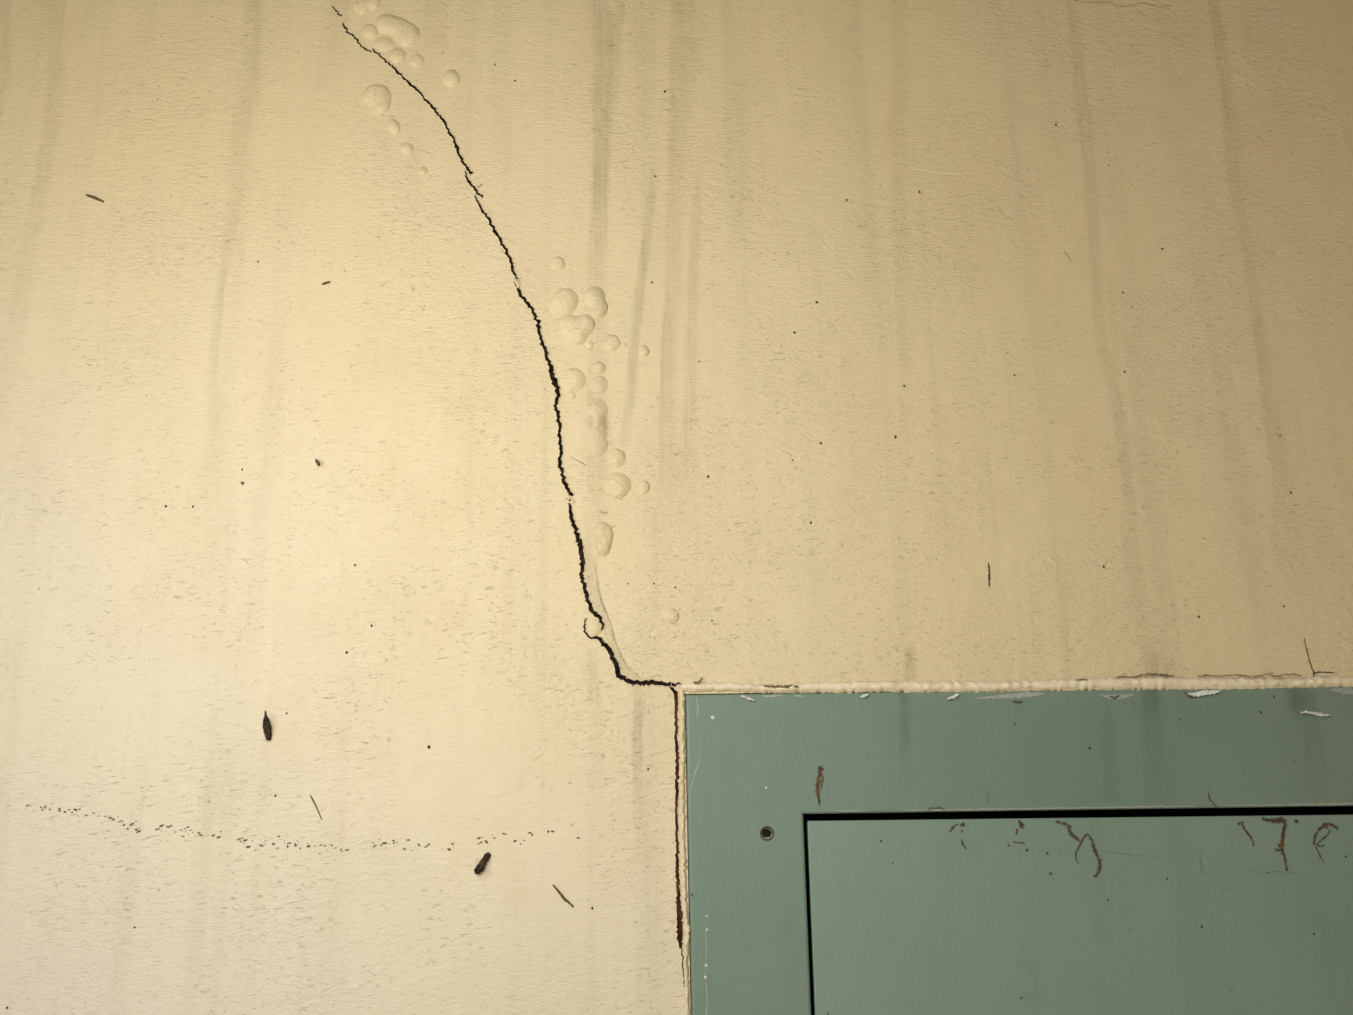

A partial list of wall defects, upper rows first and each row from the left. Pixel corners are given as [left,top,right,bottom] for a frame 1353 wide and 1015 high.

crack [330,5,685,987]